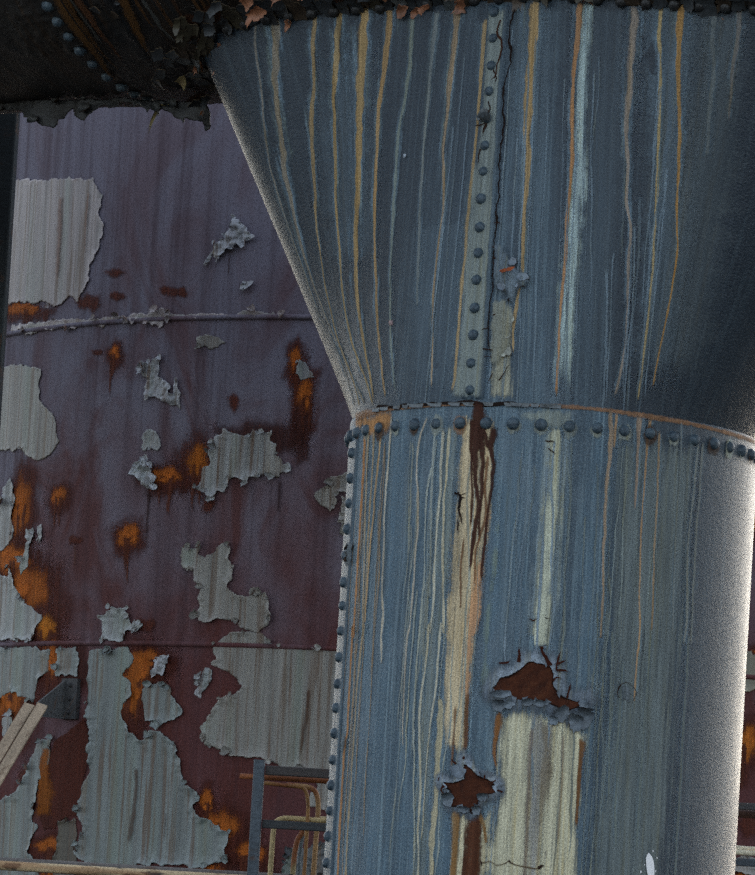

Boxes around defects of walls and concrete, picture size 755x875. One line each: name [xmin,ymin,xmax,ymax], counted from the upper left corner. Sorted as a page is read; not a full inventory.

peeling [8,176,104,308]
crack [372,9,561,413]
peeling [0,364,59,461]
corrosion [111,336,322,584]
peeling [193,428,291,502]
corrosion [254,7,496,875]
corrosion [0,453,88,756]
corrosion [19,718,88,860]
peeling [0,524,231,869]
corrosion [121,640,180,740]
peeling [180,540,336,769]
peeling [481,645,601,733]